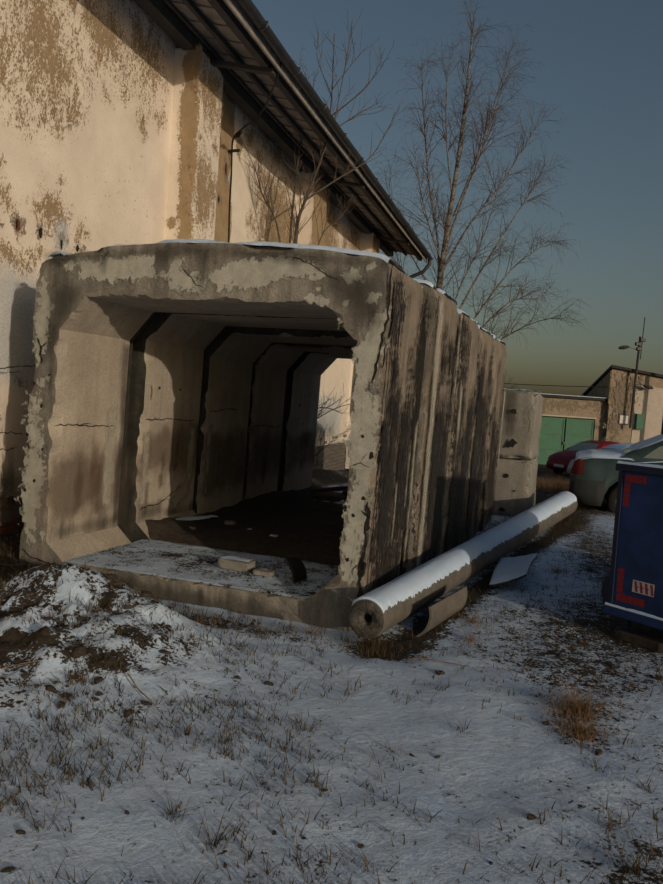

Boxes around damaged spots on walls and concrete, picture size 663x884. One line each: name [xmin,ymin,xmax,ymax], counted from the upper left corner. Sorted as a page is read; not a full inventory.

crack [59,421,113,429]
damp [103,406,118,505]
spalling [0,0,517,602]
crack [349,265,397,599]
damp [416,302,443,567]